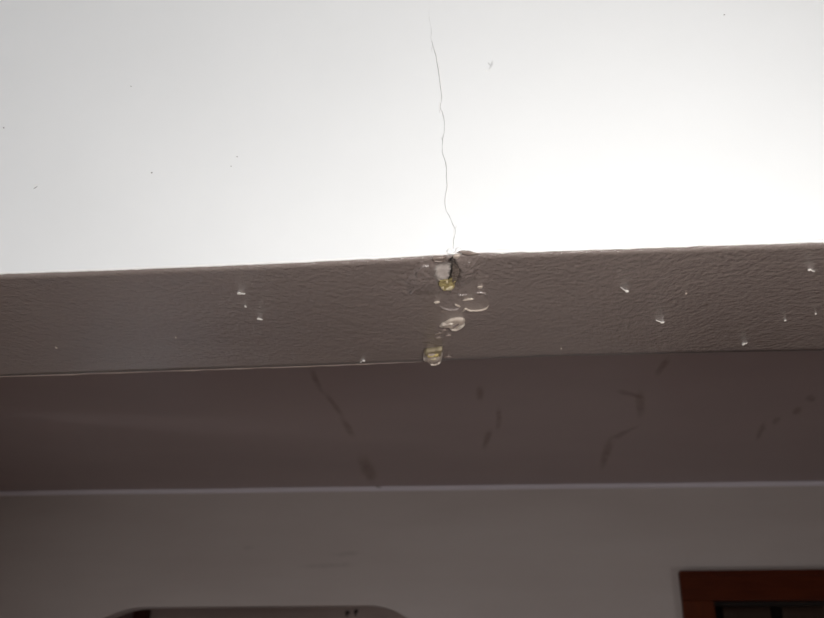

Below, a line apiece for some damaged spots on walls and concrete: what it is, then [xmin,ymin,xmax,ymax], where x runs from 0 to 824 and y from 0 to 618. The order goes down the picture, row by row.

crack [431,40,456,250]
flaking render [406,247,483,295]
peeling [435,317,465,339]